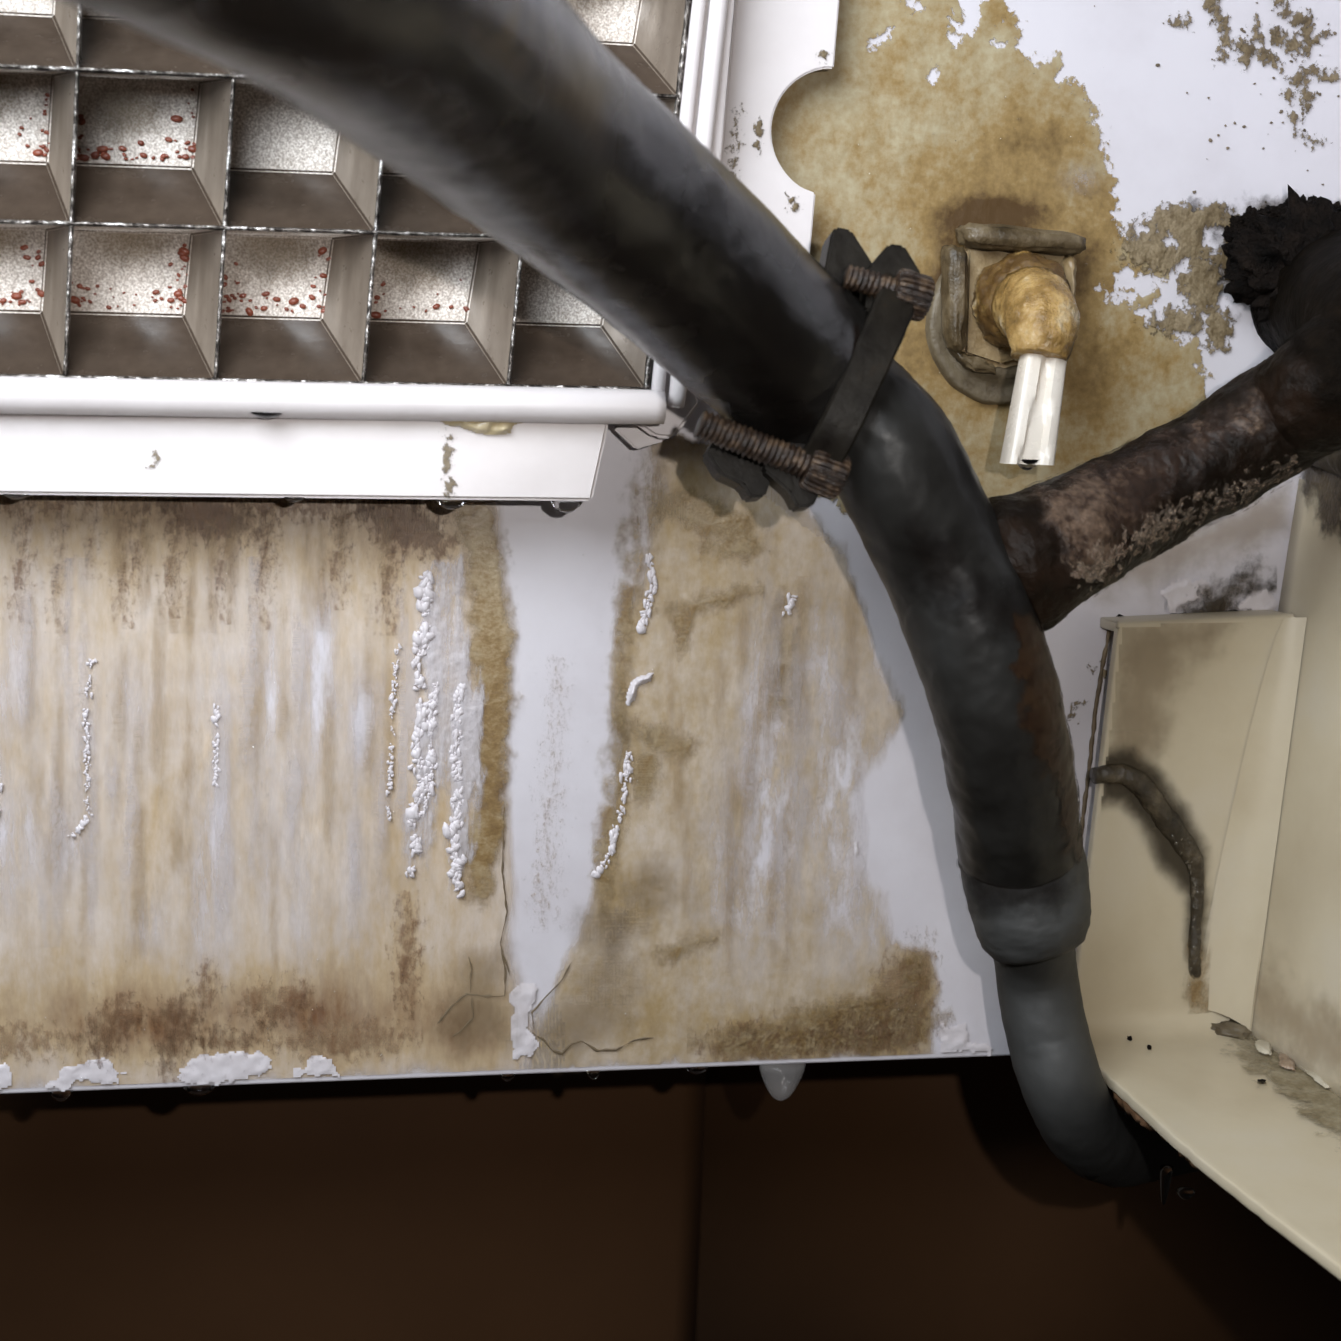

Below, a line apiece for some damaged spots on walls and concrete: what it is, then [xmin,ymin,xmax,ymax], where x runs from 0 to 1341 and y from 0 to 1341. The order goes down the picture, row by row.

damp [771,0,1341,498]
damp [0,435,948,1089]
crack [437,808,654,1055]
mould [1234,1035,1341,1134]